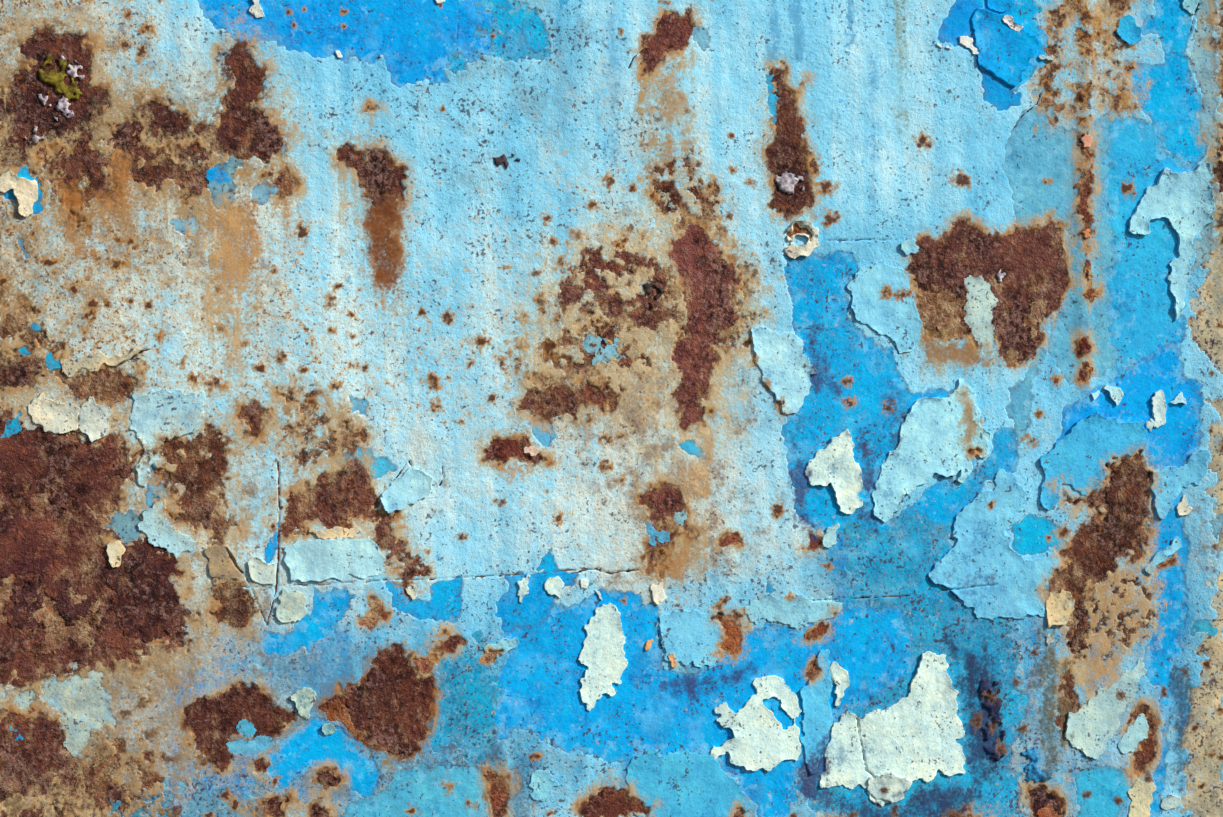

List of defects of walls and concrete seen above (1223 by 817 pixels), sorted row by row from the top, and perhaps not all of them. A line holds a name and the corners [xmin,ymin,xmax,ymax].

peeling [197,0,550,88]
peeling [205,156,243,212]
peeling [251,179,278,206]
corrosion [467,0,772,600]
corrosion [729,59,841,240]
corrosion [880,0,1151,459]
corrosion [0,0,435,817]
peeling [268,0,1223,817]
peeling [226,719,275,755]
peeling [247,522,355,658]
corrosion [314,622,467,770]
corrosion [1037,447,1179,805]